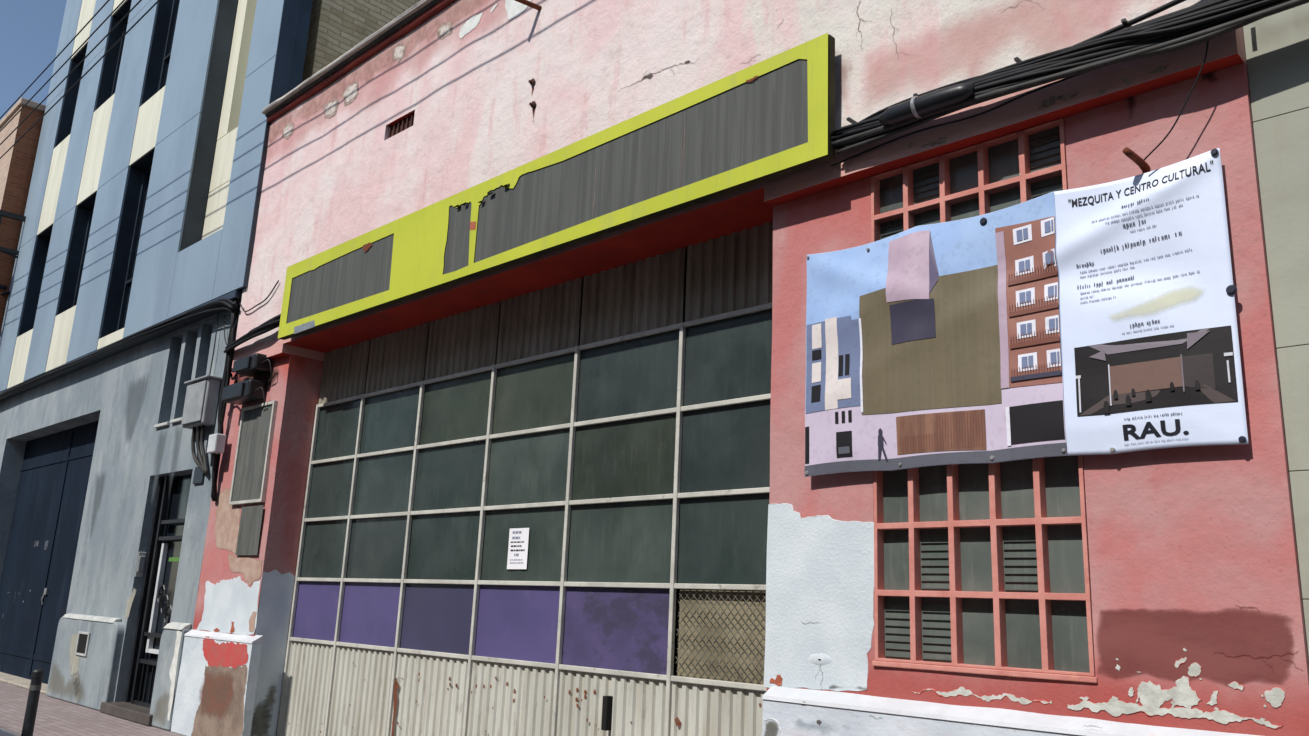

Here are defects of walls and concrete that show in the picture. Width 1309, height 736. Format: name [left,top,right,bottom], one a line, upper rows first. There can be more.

peeling [437,0,531,39]
crack [852,1,909,57]
peeling [167,488,295,736]
peeling [764,503,874,705]
peeling [911,648,1285,729]